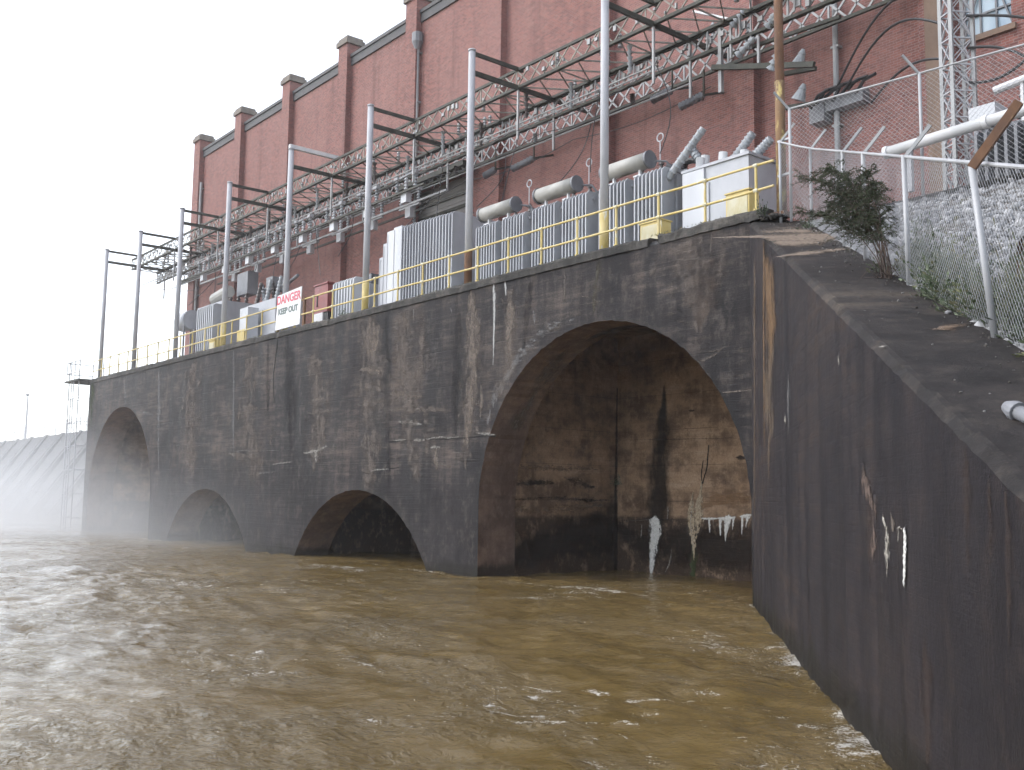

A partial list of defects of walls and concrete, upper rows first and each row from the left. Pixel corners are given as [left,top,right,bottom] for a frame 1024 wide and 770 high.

water stain [514,387,752,573]
efflorescence [882,513,906,586]